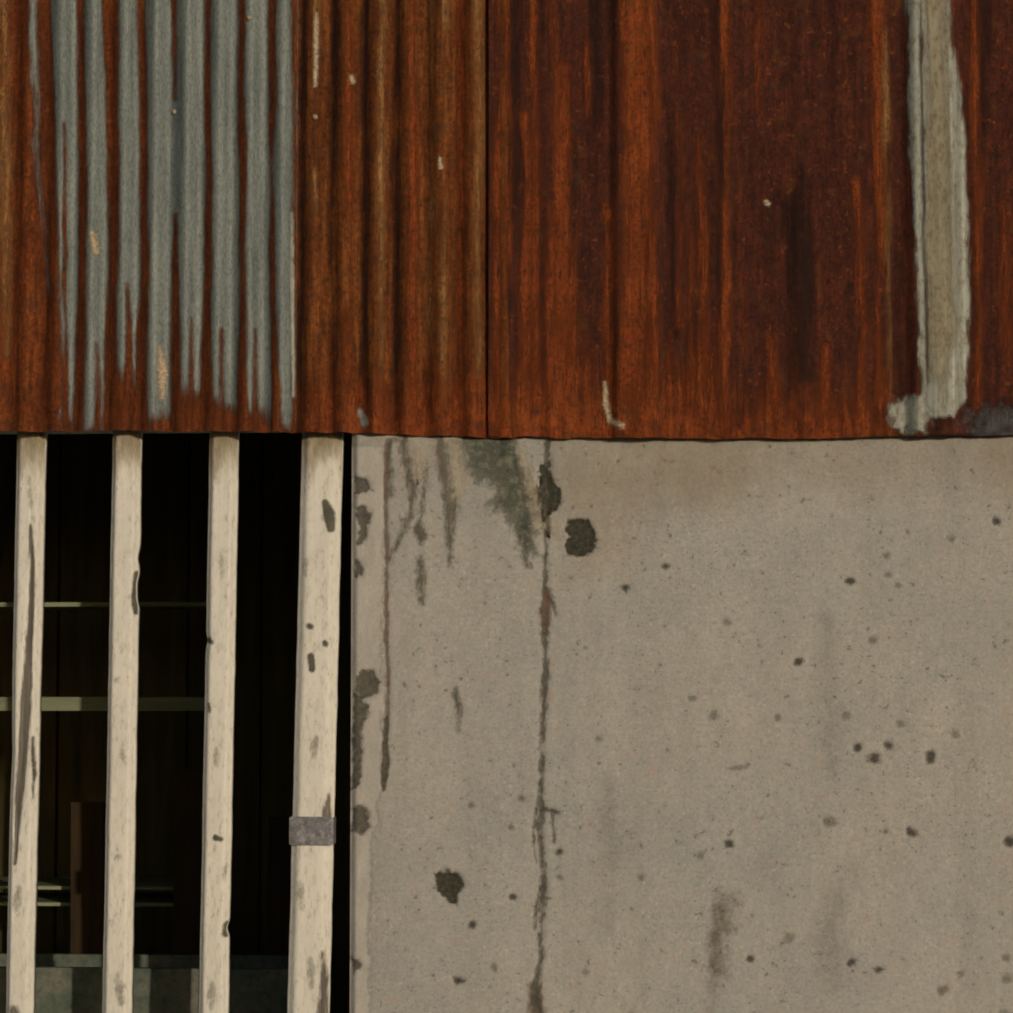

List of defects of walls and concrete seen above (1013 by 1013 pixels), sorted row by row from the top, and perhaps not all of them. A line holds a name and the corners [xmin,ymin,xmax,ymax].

corrosion [0,0,903,458]
corrosion [970,0,1013,436]
water stain [385,438,427,559]
water stain [416,557,426,605]
water stain [436,436,559,567]
spalling [565,518,597,557]
crack [528,441,560,1013]
spalling [435,869,464,904]